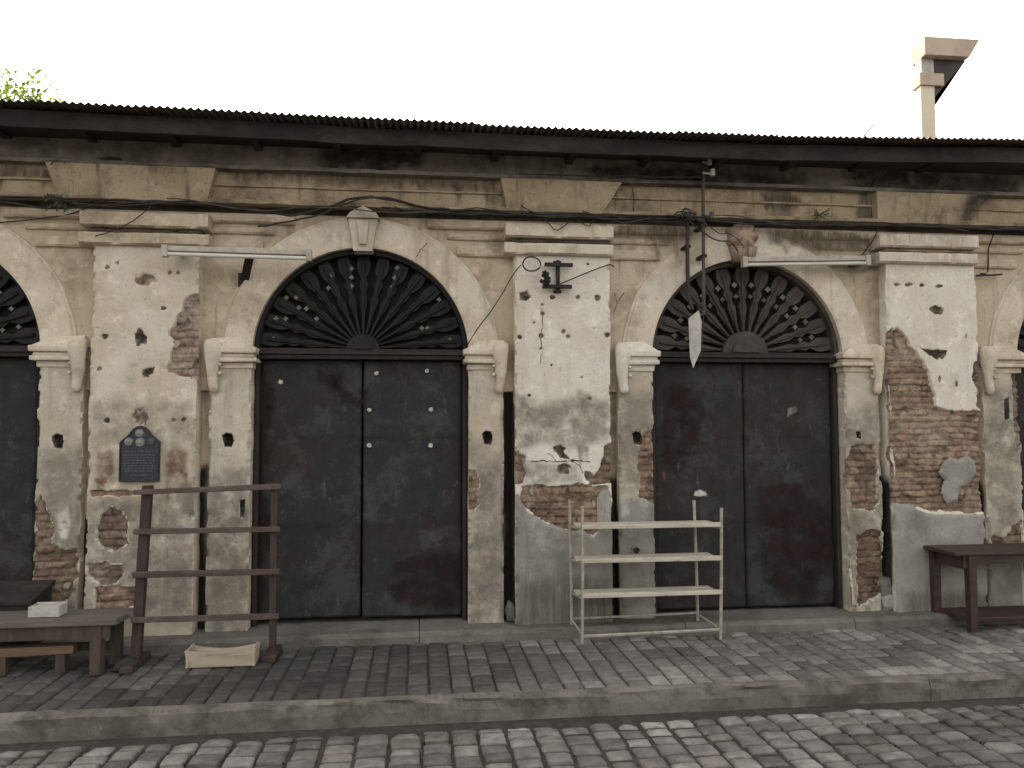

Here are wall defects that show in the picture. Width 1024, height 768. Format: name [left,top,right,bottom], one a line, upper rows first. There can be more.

leakage [324,149,494,195]
leakage [592,167,798,210]
leakage [852,170,1017,221]
spalling [167,296,200,379]
spalling [843,329,982,513]
spalling [1004,374,1021,451]
leakage [469,392,651,624]
crack [531,453,590,473]
spalling [514,444,611,535]
spalling [637,430,654,503]
spalling [33,490,135,609]
spalling [856,529,890,606]